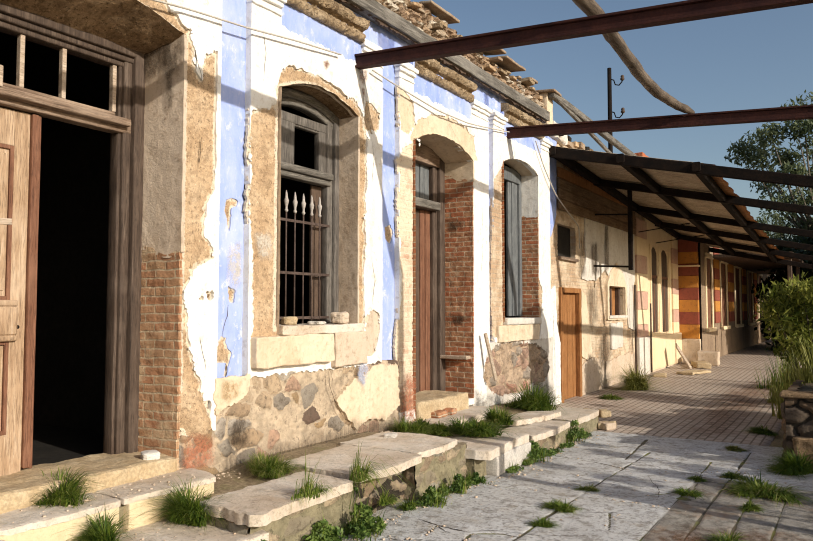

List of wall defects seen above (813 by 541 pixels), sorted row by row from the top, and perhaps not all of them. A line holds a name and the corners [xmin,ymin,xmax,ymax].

spalling [138,0,218,421]
peeling [177,417,212,469]
peeling [217,336,231,376]
spalling [224,66,381,356]
spalling [385,86,477,420]
spalling [483,158,551,396]